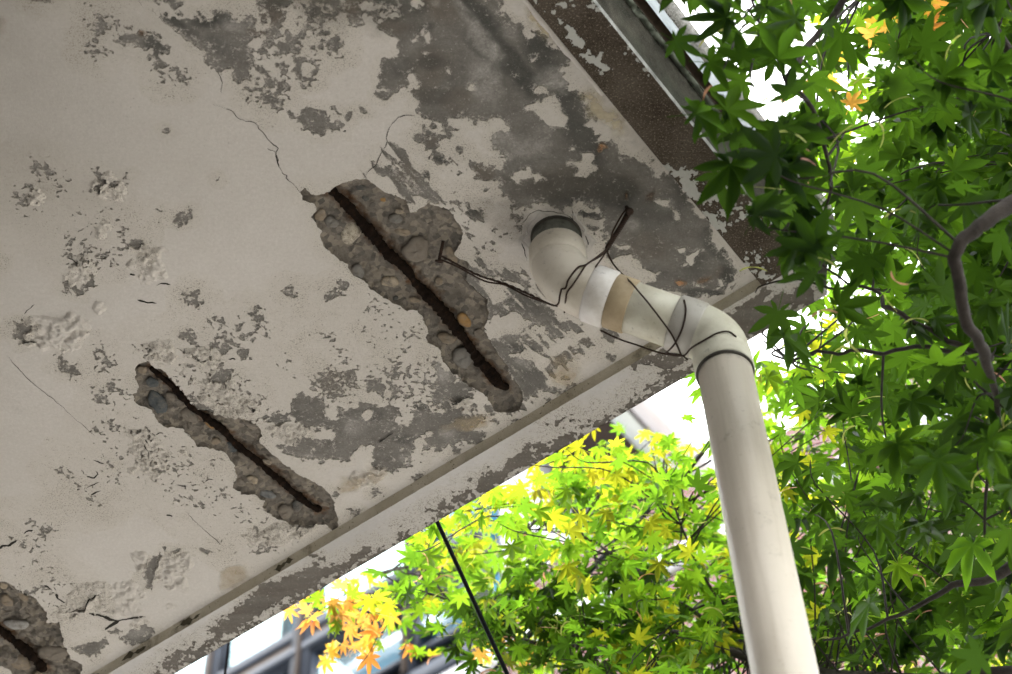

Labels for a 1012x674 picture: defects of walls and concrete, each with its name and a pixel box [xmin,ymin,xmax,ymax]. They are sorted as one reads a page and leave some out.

crack [216,73,299,191]
crack [367,115,415,173]
peeling [57,208,145,296]
peeling [83,0,817,554]
peeling [55,353,81,380]
peeling [153,348,694,674]
spalling [0,518,155,674]
crack [44,585,144,630]
peeling [143,546,180,590]